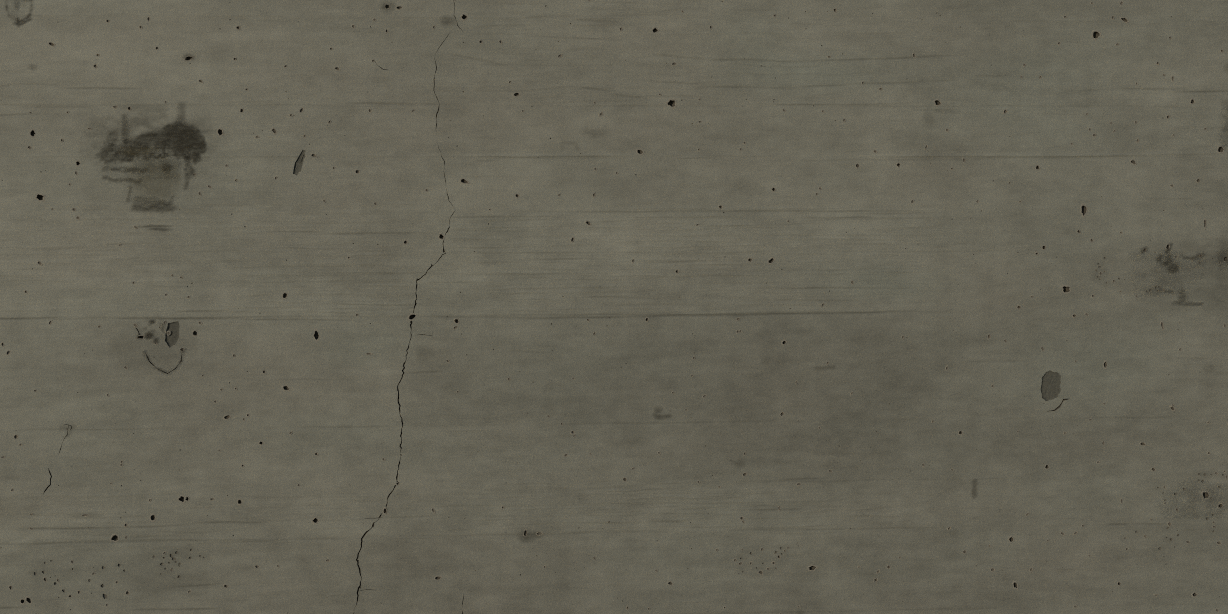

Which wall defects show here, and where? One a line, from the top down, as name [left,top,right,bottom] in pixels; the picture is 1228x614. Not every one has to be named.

leakage [101,122,206,170]
crack [353,0,462,614]